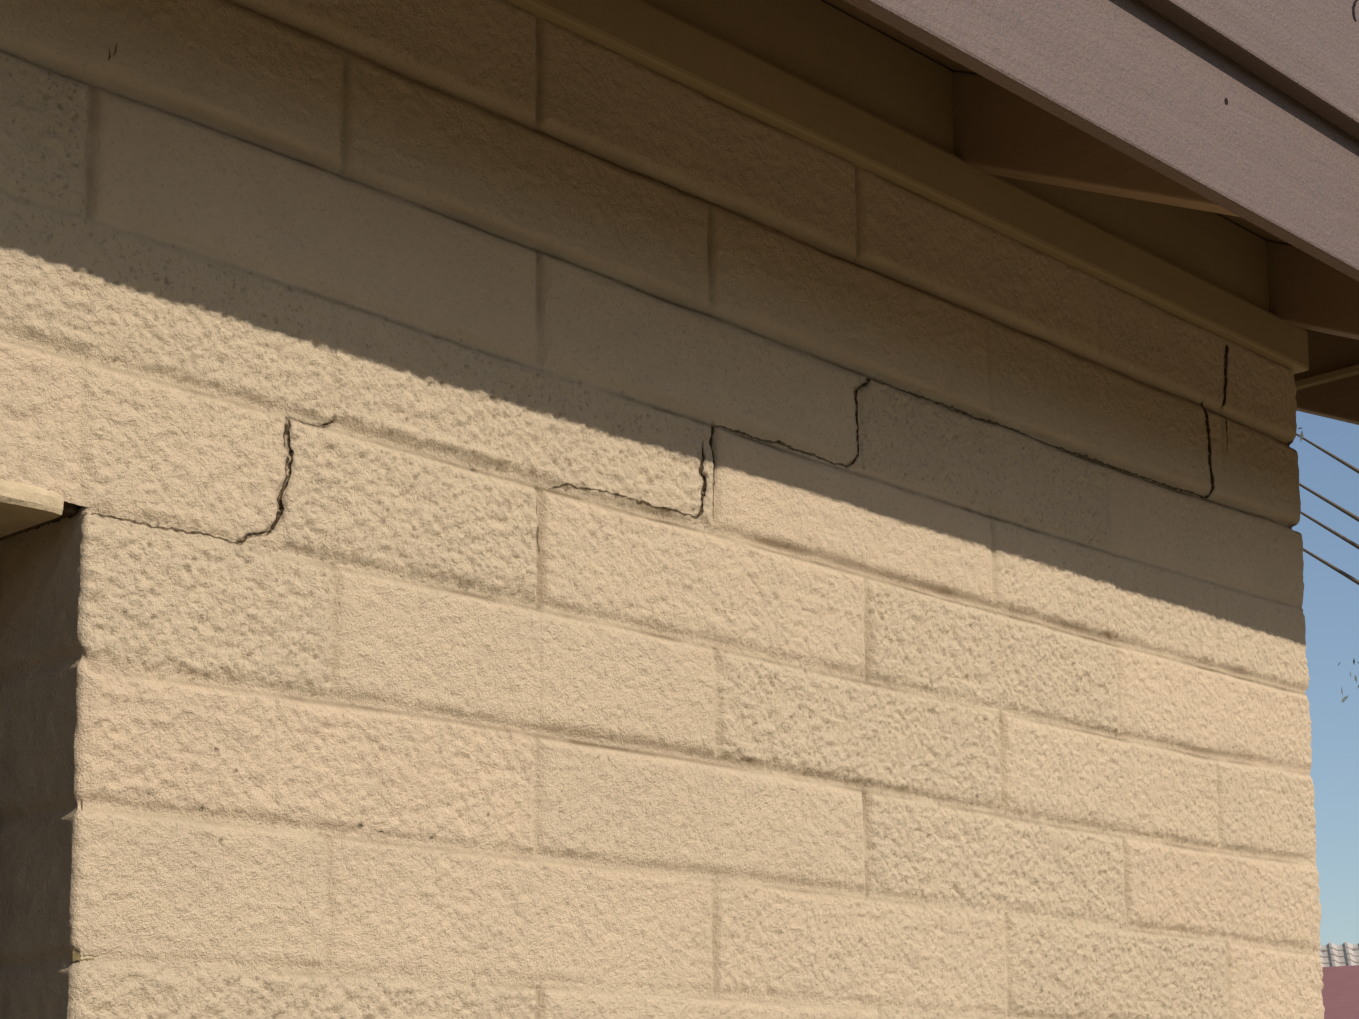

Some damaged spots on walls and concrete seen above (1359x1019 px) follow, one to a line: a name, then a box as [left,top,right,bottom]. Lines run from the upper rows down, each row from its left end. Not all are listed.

crack [26,418,335,544]
crack [536,345,1229,552]